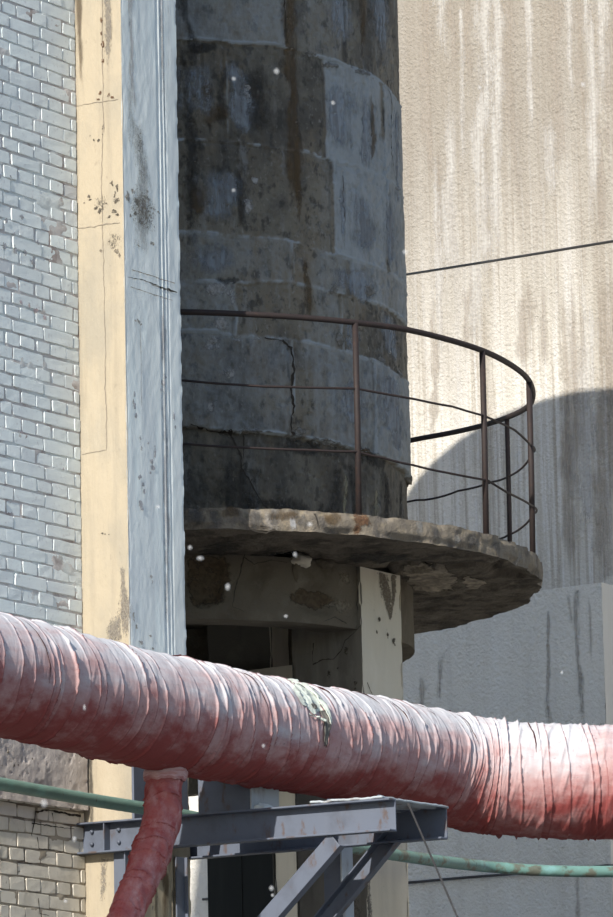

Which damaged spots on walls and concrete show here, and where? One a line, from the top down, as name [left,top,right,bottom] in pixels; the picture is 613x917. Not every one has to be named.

rust [284,0,302,213]
water stain [584,0,608,184]
water stain [434,0,502,335]
crack [130,270,177,300]
rust [303,262,312,315]
crack [265,337,295,435]
rust [353,514,371,534]
water stain [108,567,132,640]
spalling [187,555,231,608]
spalling [290,552,335,610]
spalling [376,561,487,646]
crack [31,809,82,857]